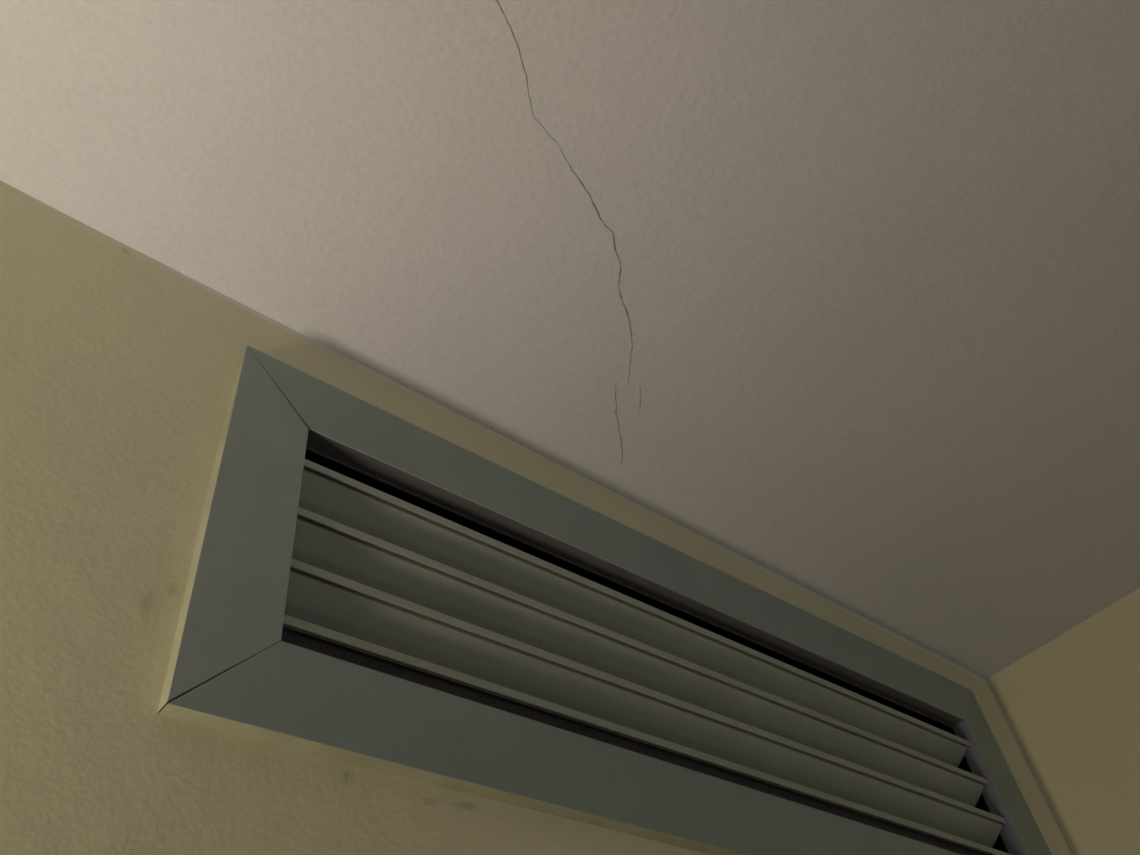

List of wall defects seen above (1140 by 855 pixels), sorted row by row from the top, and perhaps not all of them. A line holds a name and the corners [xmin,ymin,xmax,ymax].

crack [496,0,641,465]